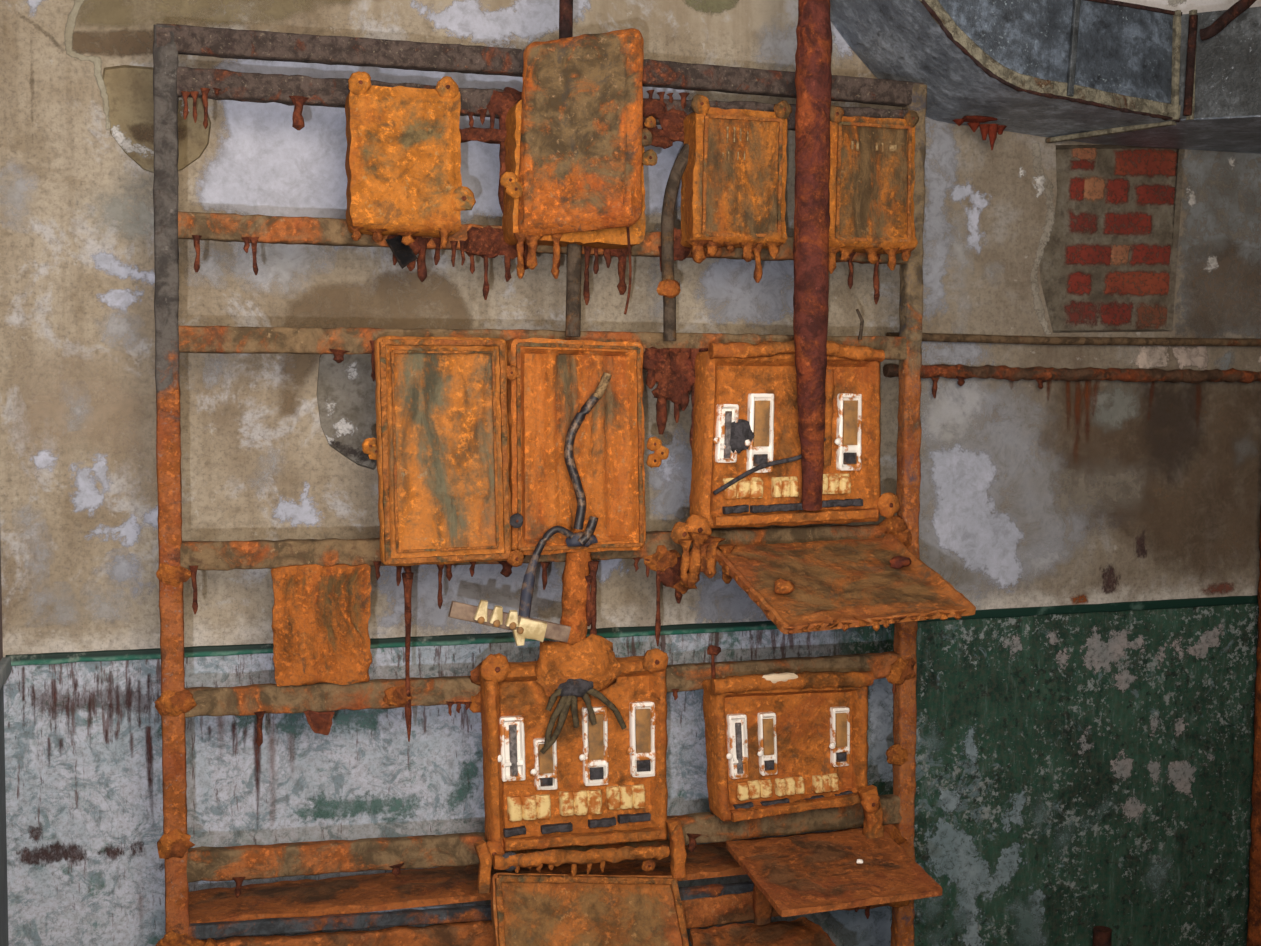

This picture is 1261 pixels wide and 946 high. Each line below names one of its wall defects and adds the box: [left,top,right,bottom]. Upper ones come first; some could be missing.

flaking render [65,0,154,173]
peeling [922,117,992,317]
flaking render [1019,143,1233,370]
flaking render [317,354,377,470]
peeling [919,341,1115,599]
leakage [1048,381,1261,595]
corrosion [106,674,197,788]
corrosion [232,711,272,811]
peeling [960,726,978,763]
peeling [1045,624,1224,693]
peeling [1110,749,1215,798]
peeling [920,787,1046,946]